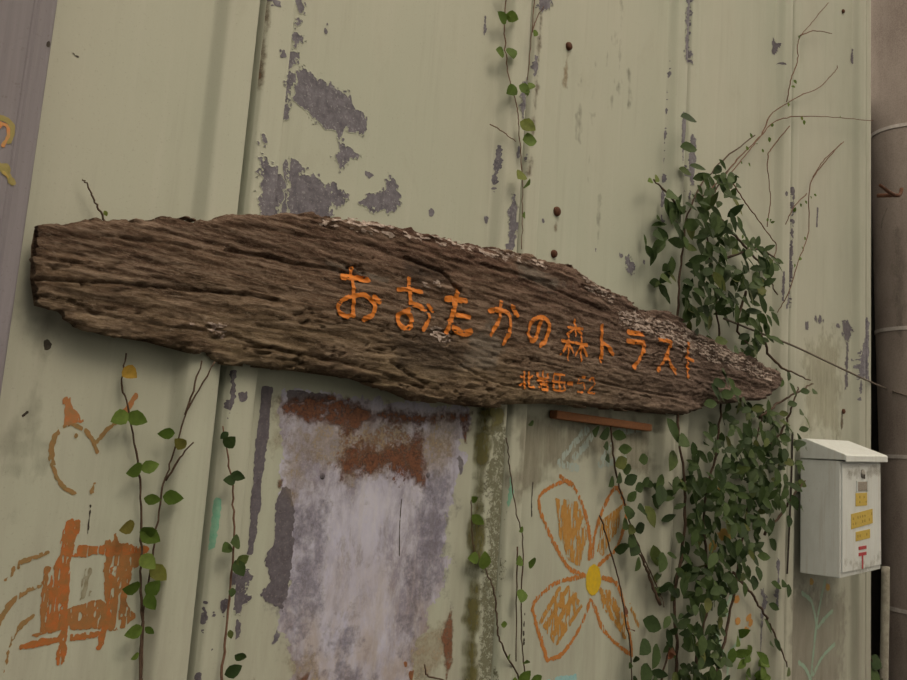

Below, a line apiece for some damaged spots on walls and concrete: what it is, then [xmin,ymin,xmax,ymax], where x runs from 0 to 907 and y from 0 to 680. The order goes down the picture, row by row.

peeling [253,0,403,218]
peeling [224,370,248,419]
peeling [200,386,472,680]
corrosion [282,394,473,488]